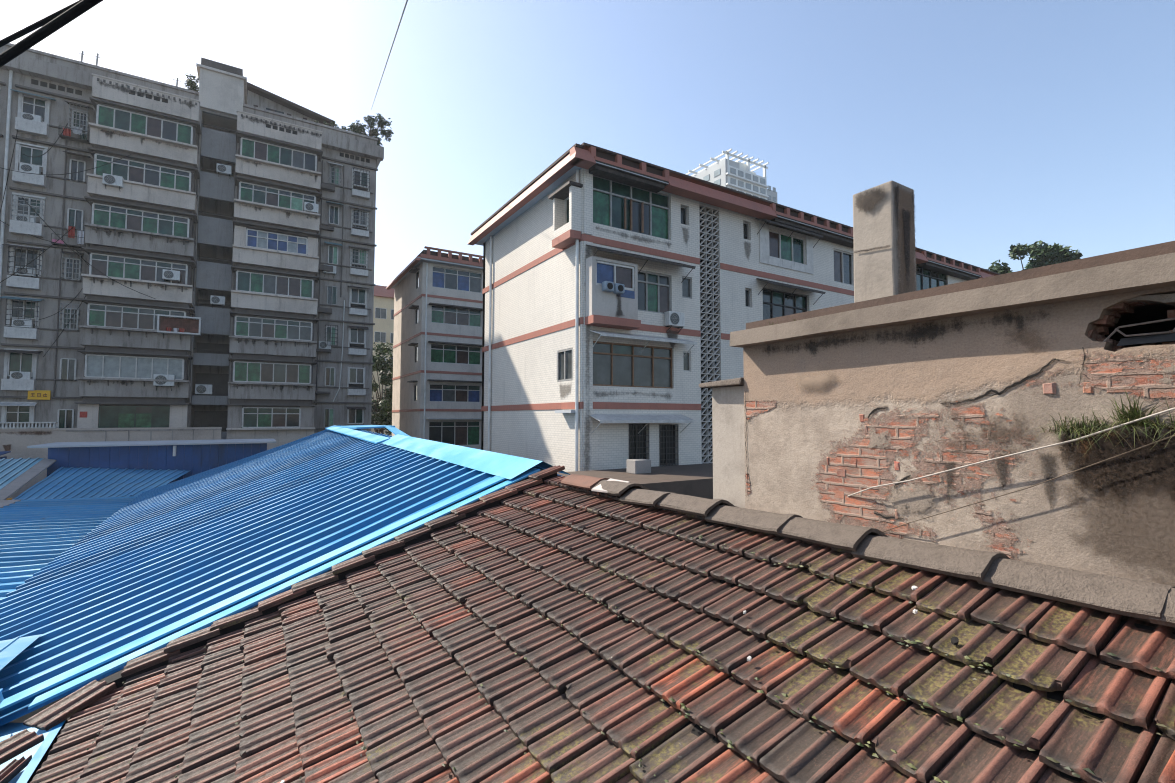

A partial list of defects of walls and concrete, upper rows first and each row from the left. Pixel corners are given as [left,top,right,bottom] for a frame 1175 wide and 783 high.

damp [856,186,916,294]
flaking render [745,399,777,420]
flaking render [811,396,1049,561]
damp [945,463,954,504]
damp [949,416,1044,490]
crack [940,347,1085,406]
flaking render [1012,302,1175,410]
damp [1039,426,1175,585]